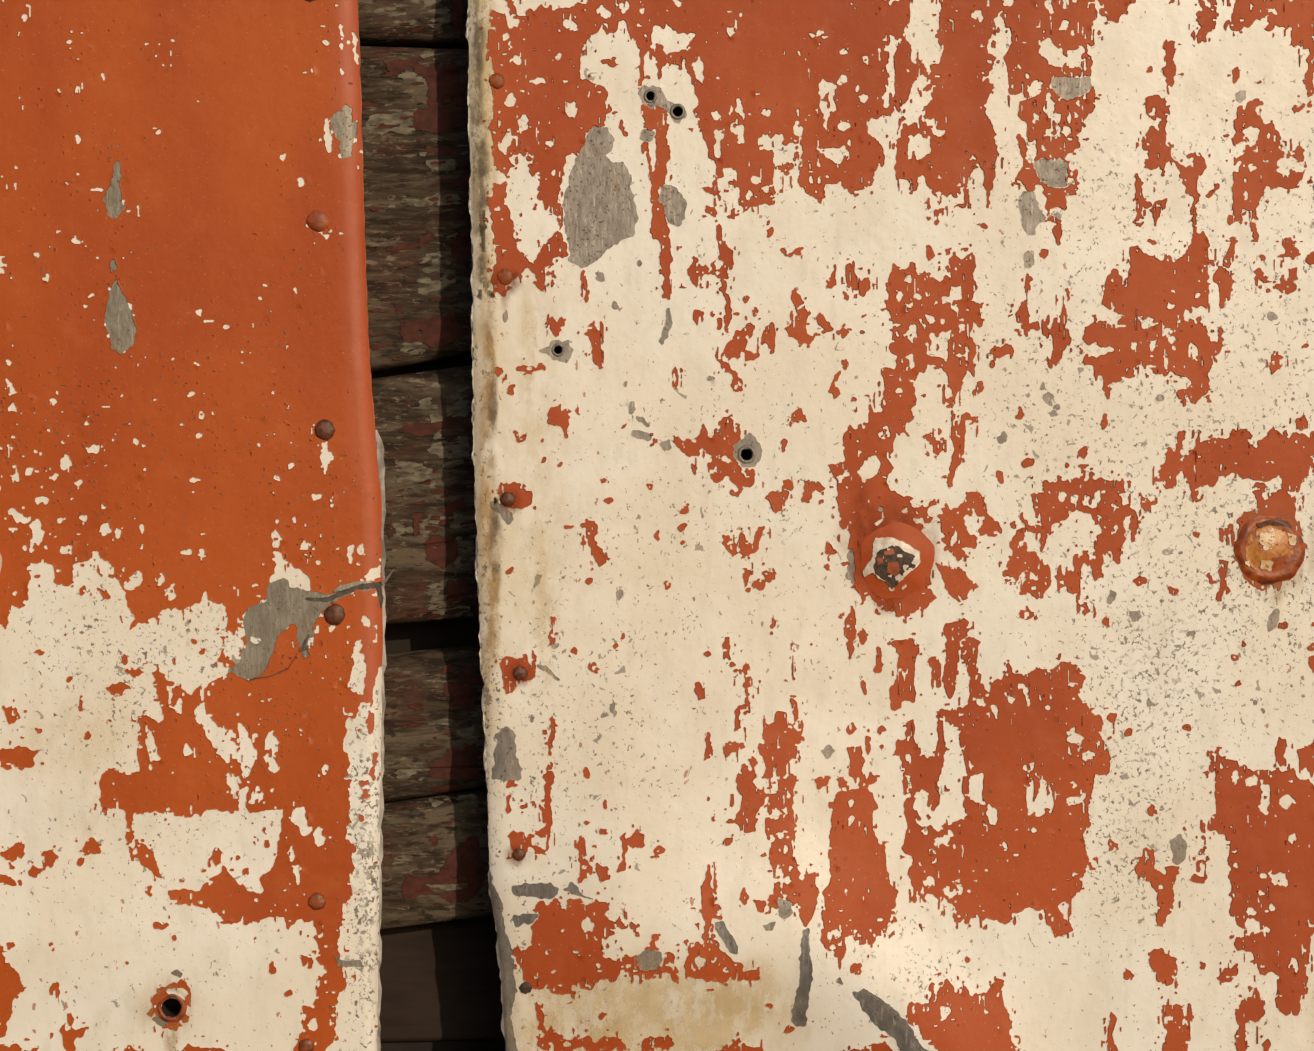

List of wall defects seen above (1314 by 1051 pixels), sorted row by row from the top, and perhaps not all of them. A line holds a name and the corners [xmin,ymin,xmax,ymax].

leakage [472,22,493,213]
peeling [34,230,146,368]
peeling [319,0,1314,985]
crack [305,569,394,608]
corrosion [877,548,900,576]
corrosion [1245,525,1294,573]
crack [249,634,309,681]
peeling [0,344,764,1051]
peeling [1131,737,1314,1051]
peeling [843,1034,893,1051]
peeling [906,956,1021,1051]
peeling [1101,1012,1121,1051]